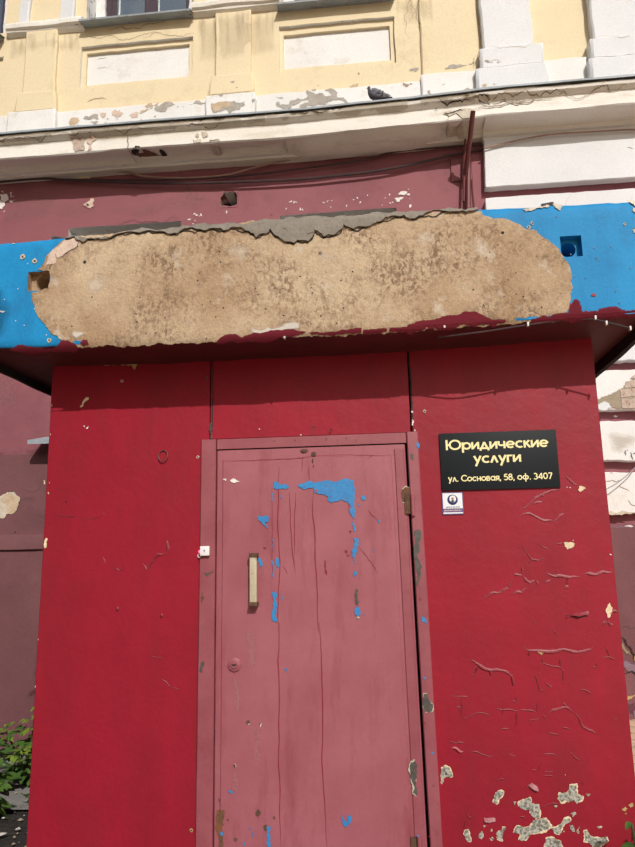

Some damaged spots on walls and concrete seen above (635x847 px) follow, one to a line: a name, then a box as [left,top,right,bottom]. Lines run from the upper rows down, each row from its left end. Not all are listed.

peeling [69,94,255,128]
peeling [276,85,358,114]
crack [435,84,627,114]
spalling [131,146,167,157]
peeling [20,211,575,348]
flaking render [598,375,635,417]
flaking render [0,491,21,519]
peeling [271,478,366,577]
crack [485,475,611,597]
crack [451,609,635,788]
flaking render [432,765,453,787]
flaking render [463,783,609,847]